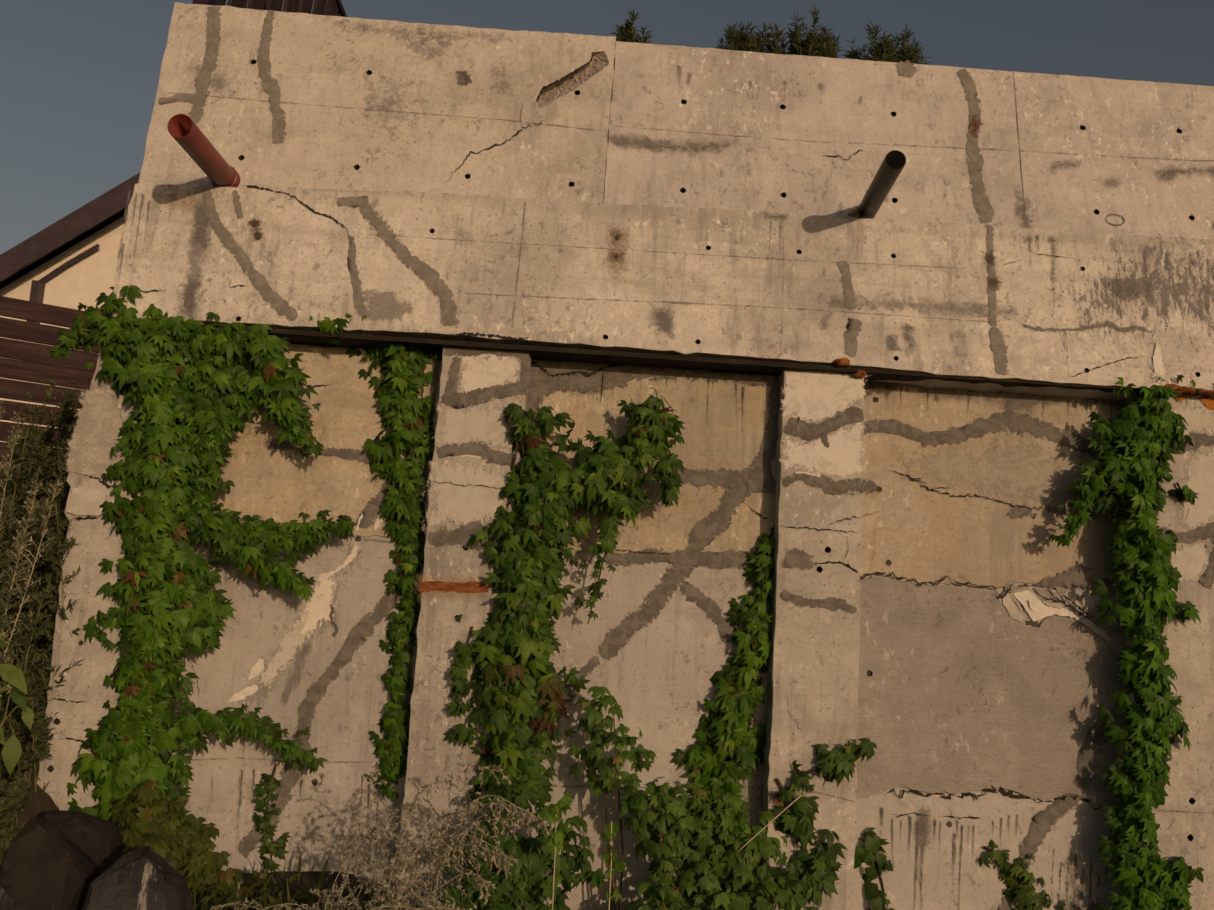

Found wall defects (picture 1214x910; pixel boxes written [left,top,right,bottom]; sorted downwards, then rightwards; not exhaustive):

crack [257,10,287,143]
spalling [536,51,609,109]
crack [896,60,919,77]
damp [887,324,914,350]
damp [830,299,1013,316]
damp [1016,199,1214,352]
crack [201,68,1124,740]
corrosion [1176,395,1214,410]
corrosion [419,578,489,595]
peeling [995,580,1126,650]
crack [886,710,1111,910]
damp [880,808,974,897]